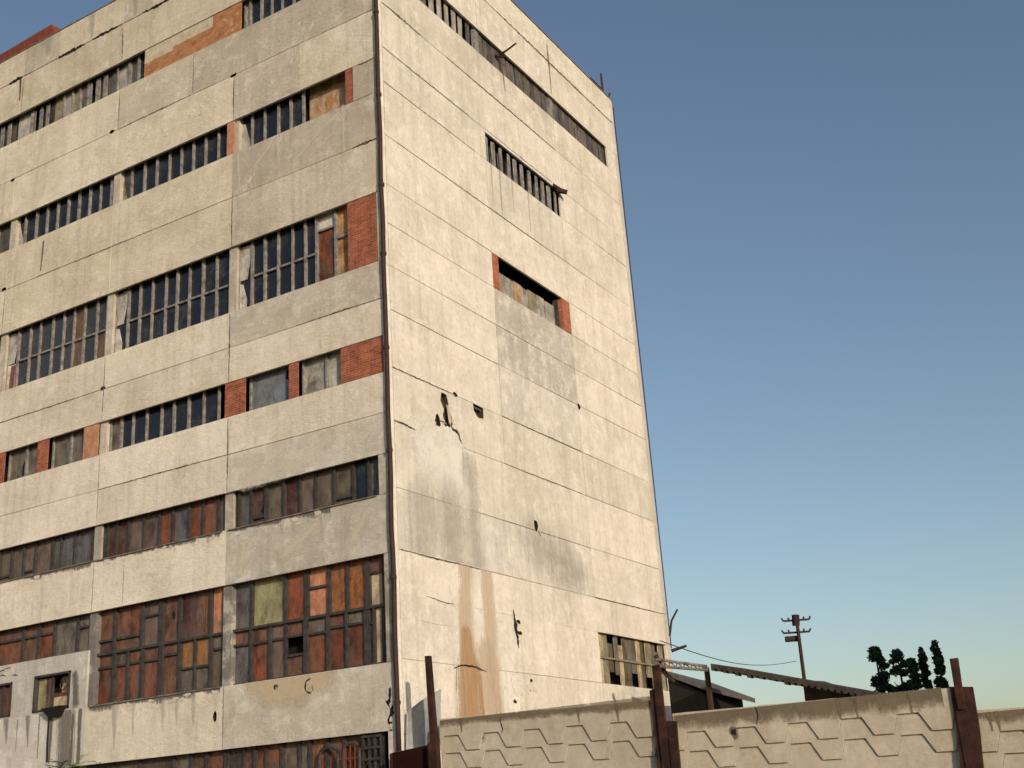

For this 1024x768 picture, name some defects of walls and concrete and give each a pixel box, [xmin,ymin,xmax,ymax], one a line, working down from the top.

spalling [435,392,462,442]
corrosion [459,565,502,717]
leakage [4,671,82,768]